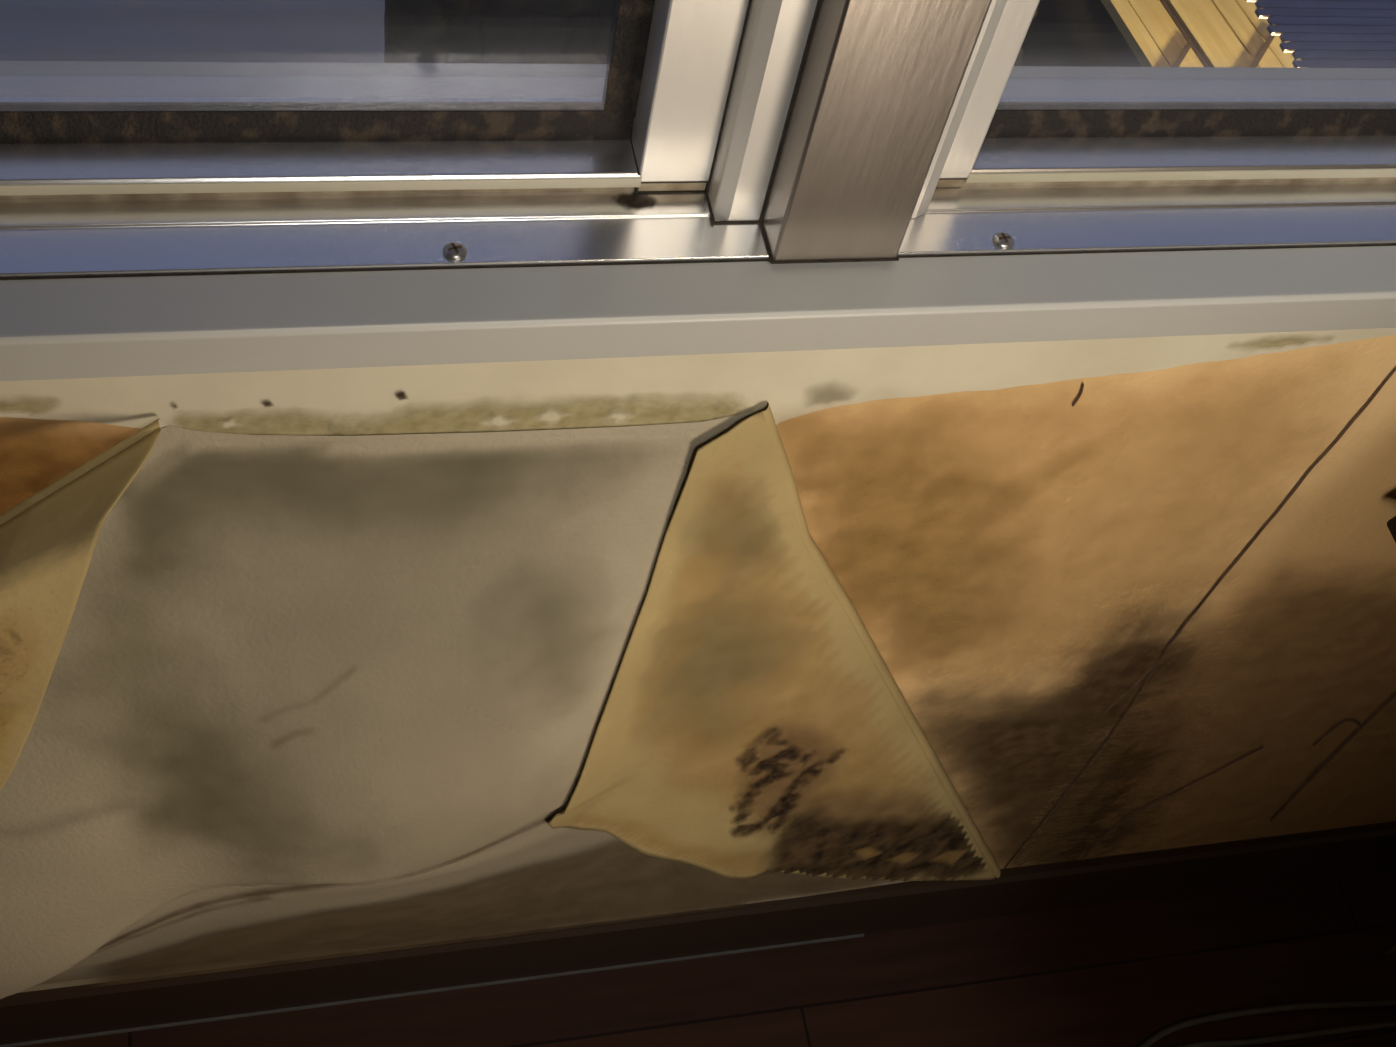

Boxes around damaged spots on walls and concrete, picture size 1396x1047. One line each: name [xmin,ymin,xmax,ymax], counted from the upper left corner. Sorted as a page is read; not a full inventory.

damp [111,591,1396,985]